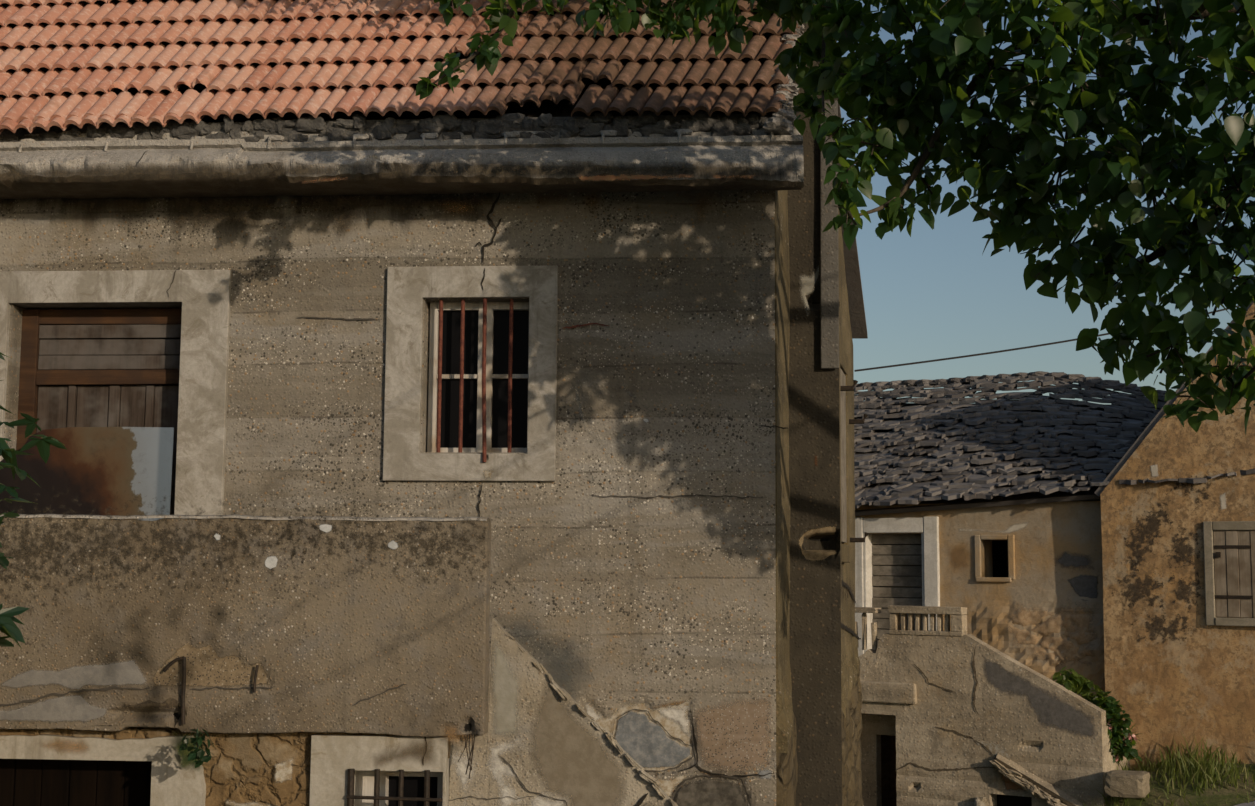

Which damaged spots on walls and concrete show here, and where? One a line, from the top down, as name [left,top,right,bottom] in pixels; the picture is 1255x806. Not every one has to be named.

crack [476,192,502,290]
leakage [1111,475,1210,644]
spalling [125,643,270,720]
crack [895,646,995,771]
crack [451,796,567,805]